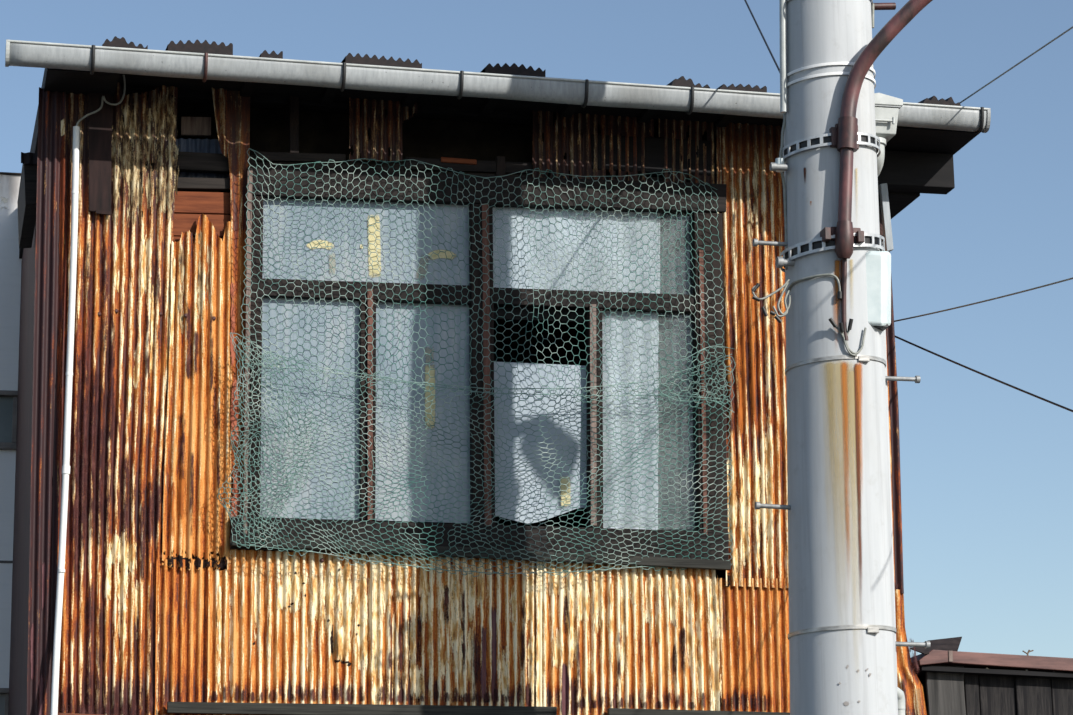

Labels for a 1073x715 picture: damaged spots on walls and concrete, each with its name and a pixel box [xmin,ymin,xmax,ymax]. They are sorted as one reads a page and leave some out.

peeling [106,86,180,231]
corrosion [185,302,213,392]
corrosion [725,233,764,434]
corrosion [56,242,162,715]
corrosion [178,415,194,531]
corrosion [827,363,862,574]
corrosion [210,593,533,703]
corrosion [561,596,706,715]
corrosion [723,572,731,630]
corrosion [902,640,922,715]